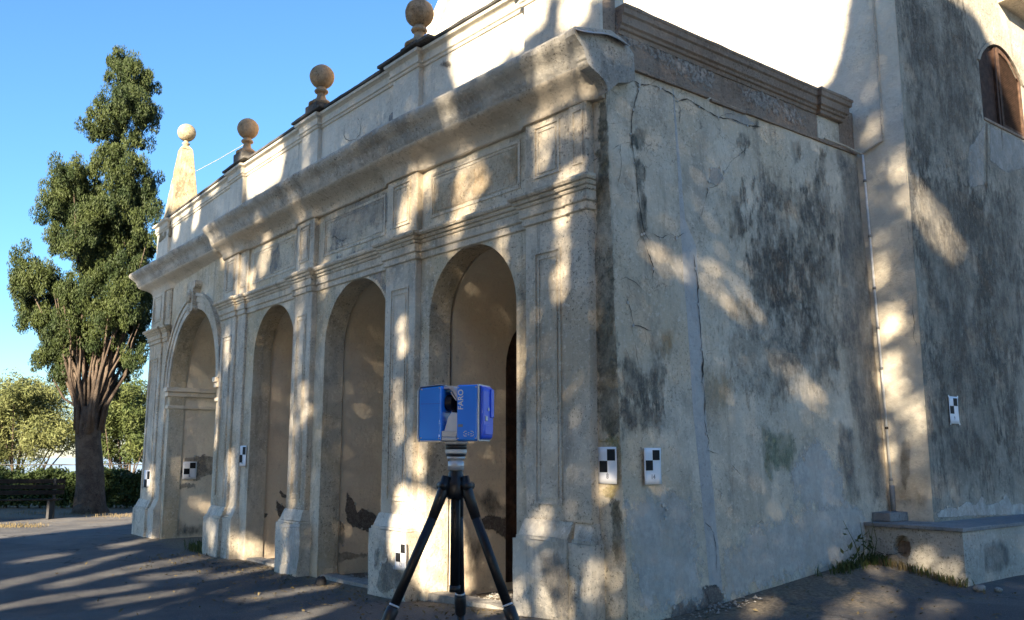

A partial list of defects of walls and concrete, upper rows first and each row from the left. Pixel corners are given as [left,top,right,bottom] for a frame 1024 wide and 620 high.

peeling [338,493,377,555]
crack [593,80,759,473]
damp [724,180,879,601]
damp [903,0,1024,483]